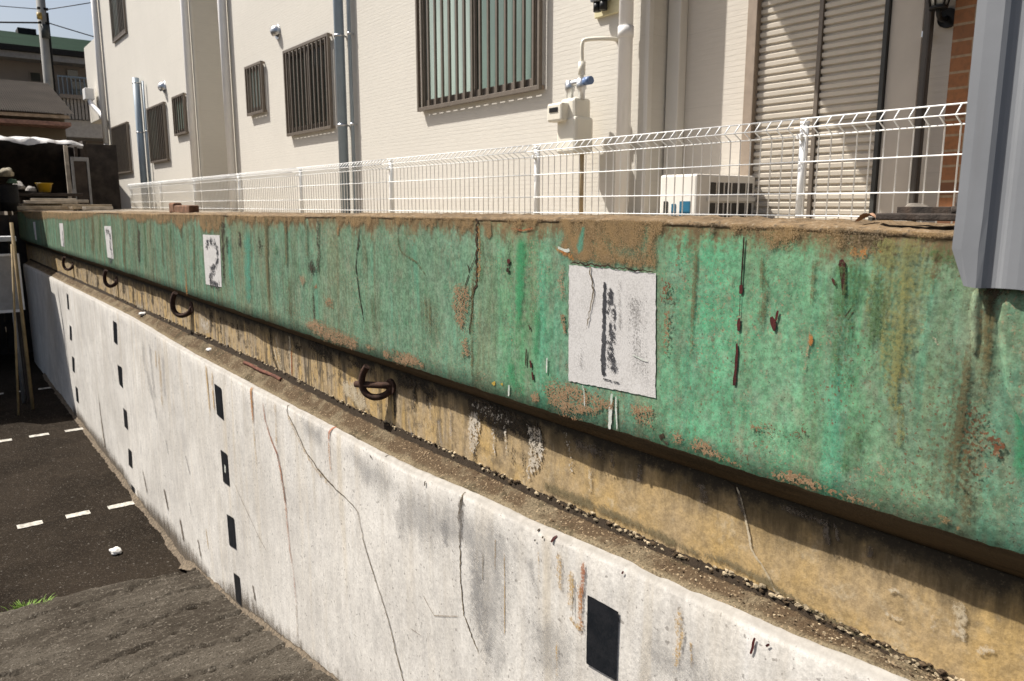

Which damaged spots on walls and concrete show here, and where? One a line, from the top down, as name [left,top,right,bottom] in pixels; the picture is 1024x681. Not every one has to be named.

crack [463,218,483,375]
peeling [546,219,673,354]
peeling [529,376,742,467]
rust [250,388,297,619]
crack [287,405,479,680]
rust [556,555,585,631]
water stain [467,396,891,653]
crack [730,483,782,596]
peeling [771,470,879,509]